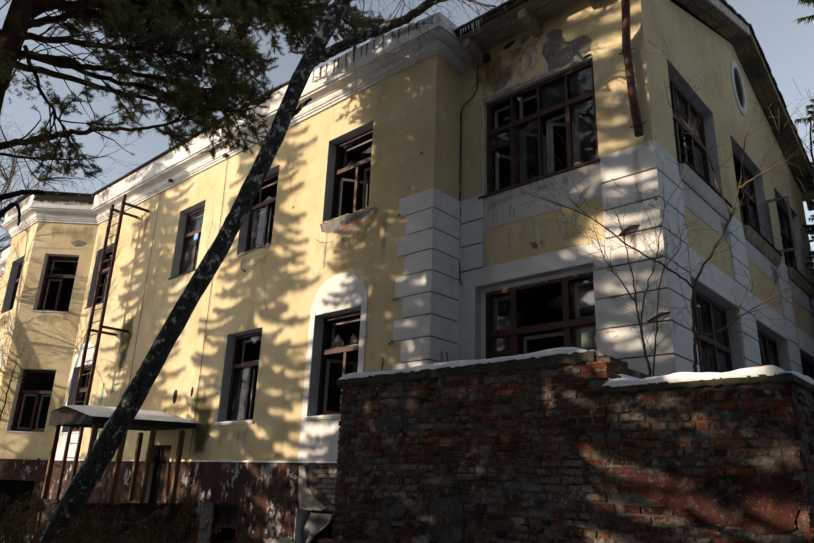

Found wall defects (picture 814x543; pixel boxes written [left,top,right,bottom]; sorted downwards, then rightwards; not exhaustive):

spalling [482,27,594,103]
spalling [320,206,378,236]
flaking render [221,464,337,543]